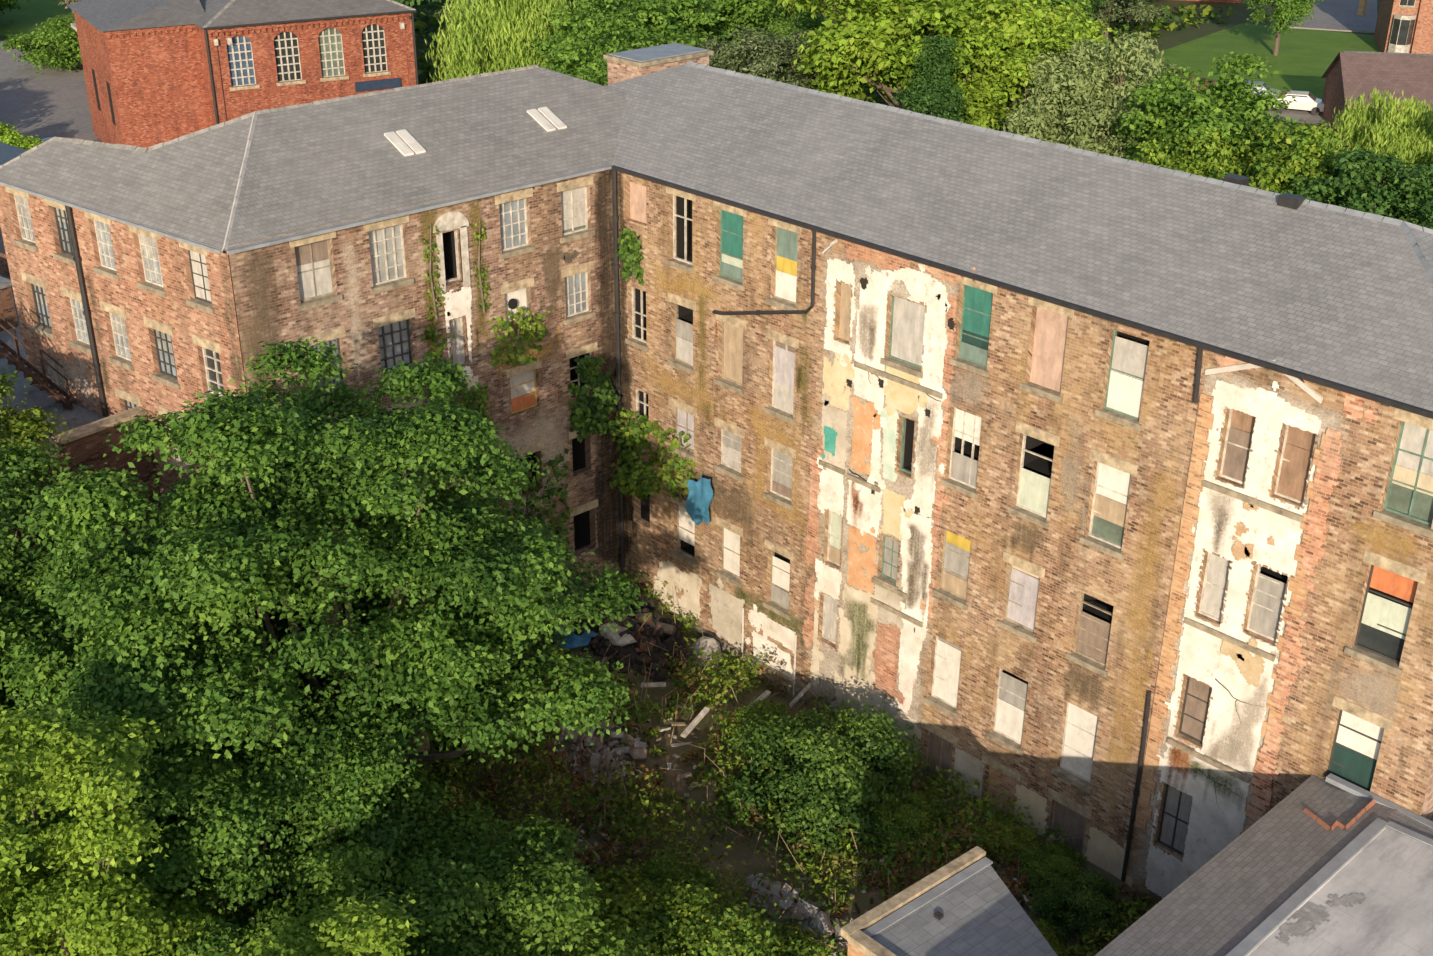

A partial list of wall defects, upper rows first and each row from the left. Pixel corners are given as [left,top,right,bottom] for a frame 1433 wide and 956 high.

flaking render [652,240,978,761]
damp [907,526,927,607]
flaking render [1084,354,1380,899]